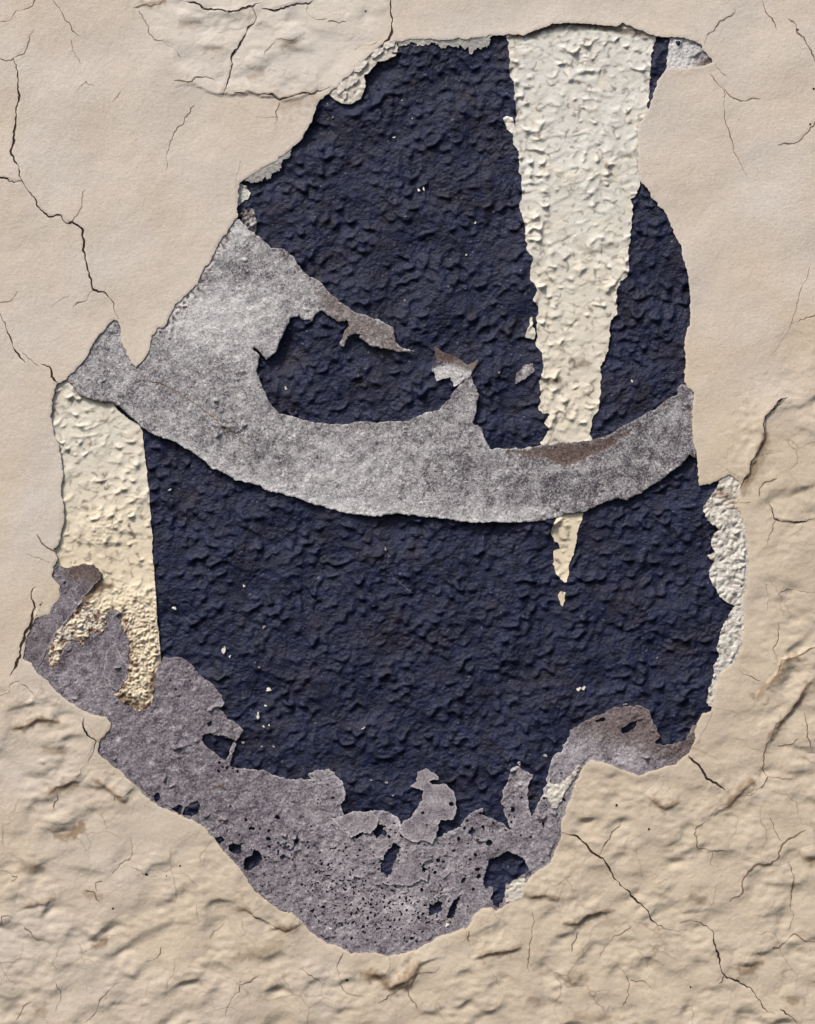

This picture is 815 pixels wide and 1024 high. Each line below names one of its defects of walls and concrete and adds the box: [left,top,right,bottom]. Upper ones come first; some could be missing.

crack [132,0,346,165]
crack [370,0,393,48]
crack [0,0,118,317]
crack [0,292,57,382]
crack [738,398,815,542]
peeling [49,635,69,667]
spalling [54,605,106,646]
crack [688,677,815,866]
peeling [427,901,443,918]
peeling [447,897,460,919]
crack [562,822,797,1023]
crack [729,818,815,949]